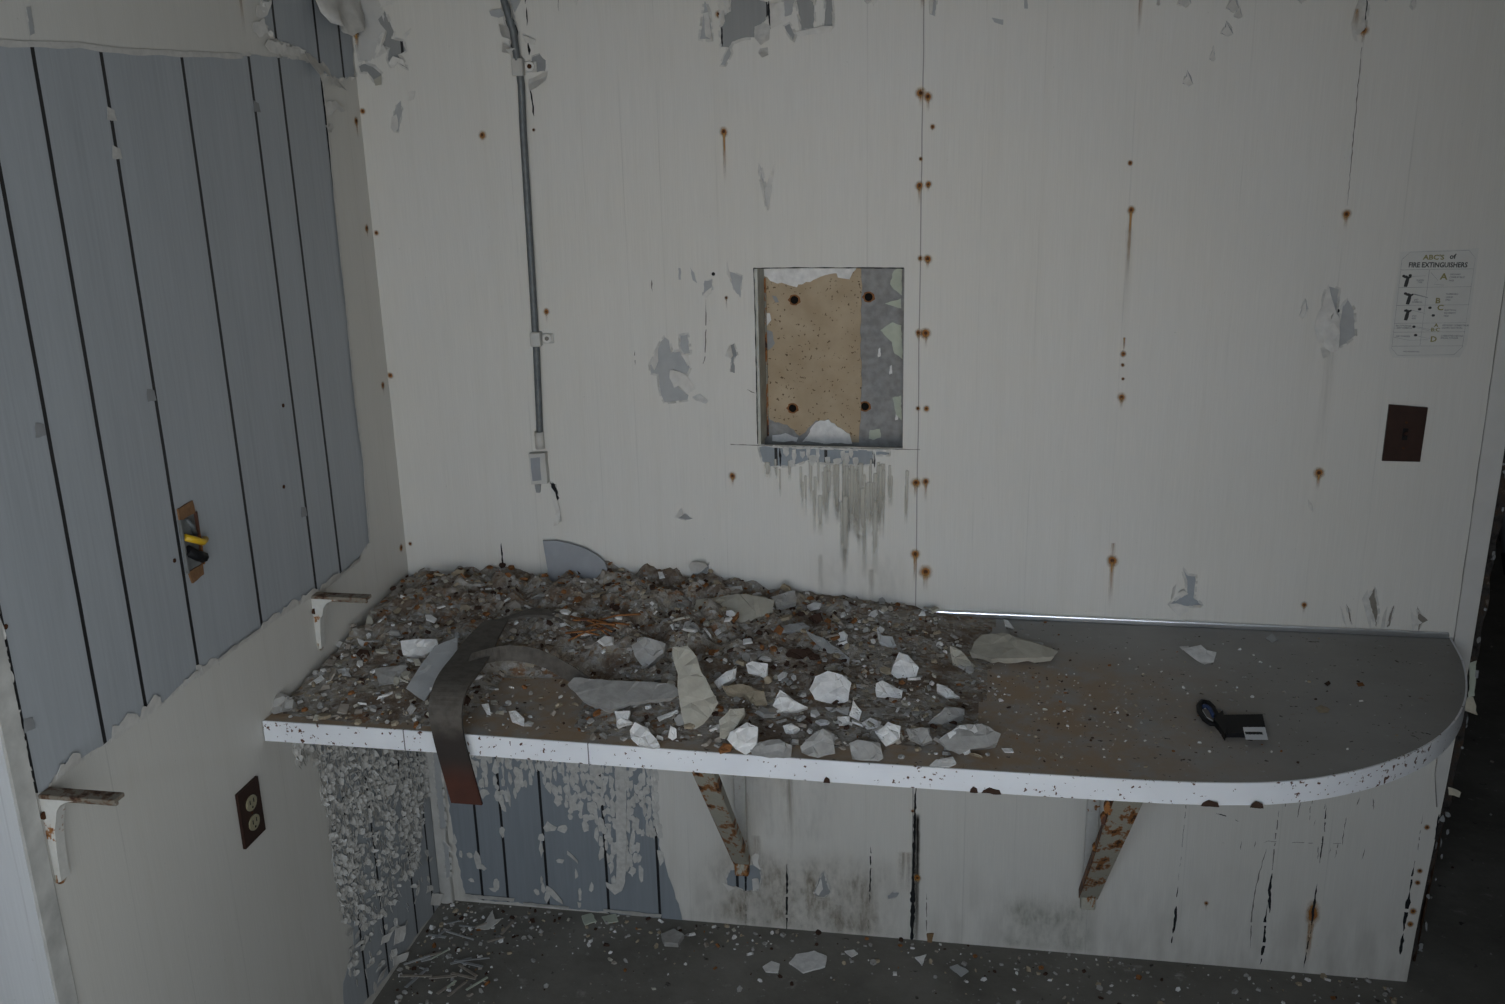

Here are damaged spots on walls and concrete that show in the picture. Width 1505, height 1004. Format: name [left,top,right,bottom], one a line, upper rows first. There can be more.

peeling [252,0,302,57]
peeling [355,0,412,86]
peeling [698,0,835,67]
peeling [648,333,708,404]
leakage [765,459,909,546]
rust [912,551,930,577]
spalling [1410,449,1505,964]
peeling [292,743,682,1004]
rust [1308,904,1318,940]